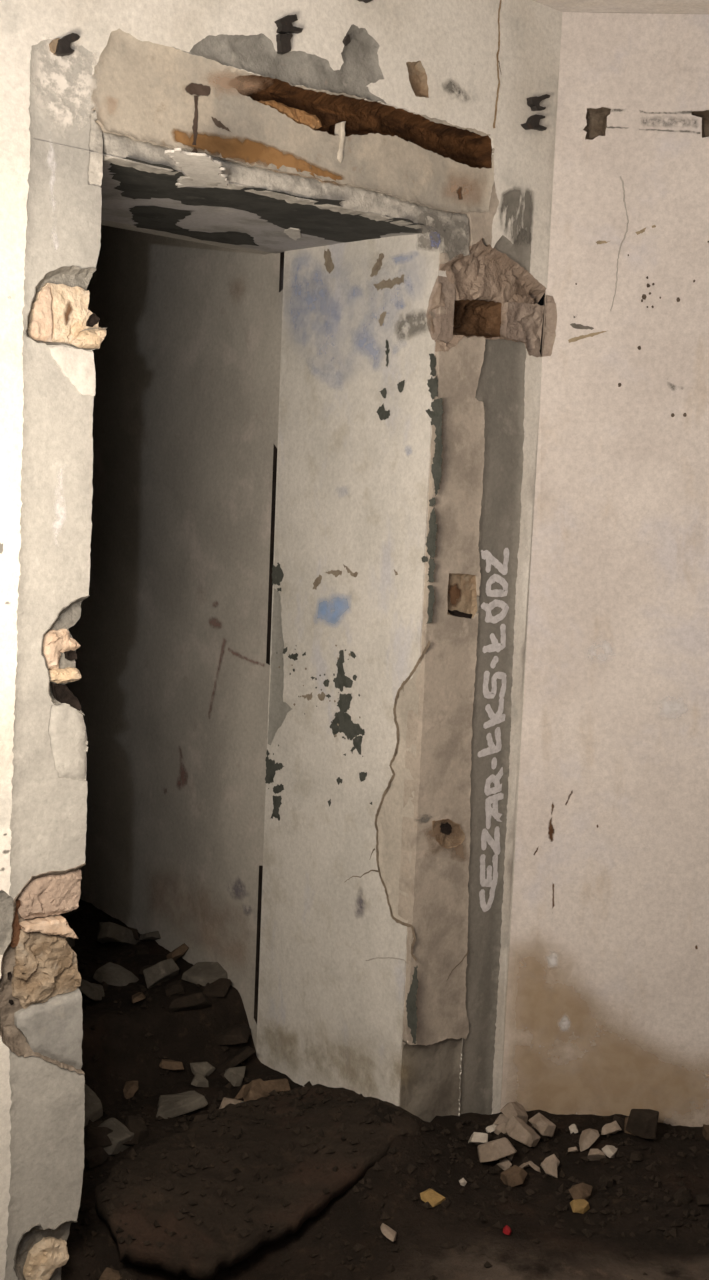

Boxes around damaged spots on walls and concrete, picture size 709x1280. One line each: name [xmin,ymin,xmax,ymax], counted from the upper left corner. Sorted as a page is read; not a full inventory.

corrosion [173,83,343,184]
flaking render [583,107,611,140]
spalling [0,24,560,1280]
crack [344,641,430,966]
leakage [514,954,709,1123]
flaking render [568,1121,622,1161]